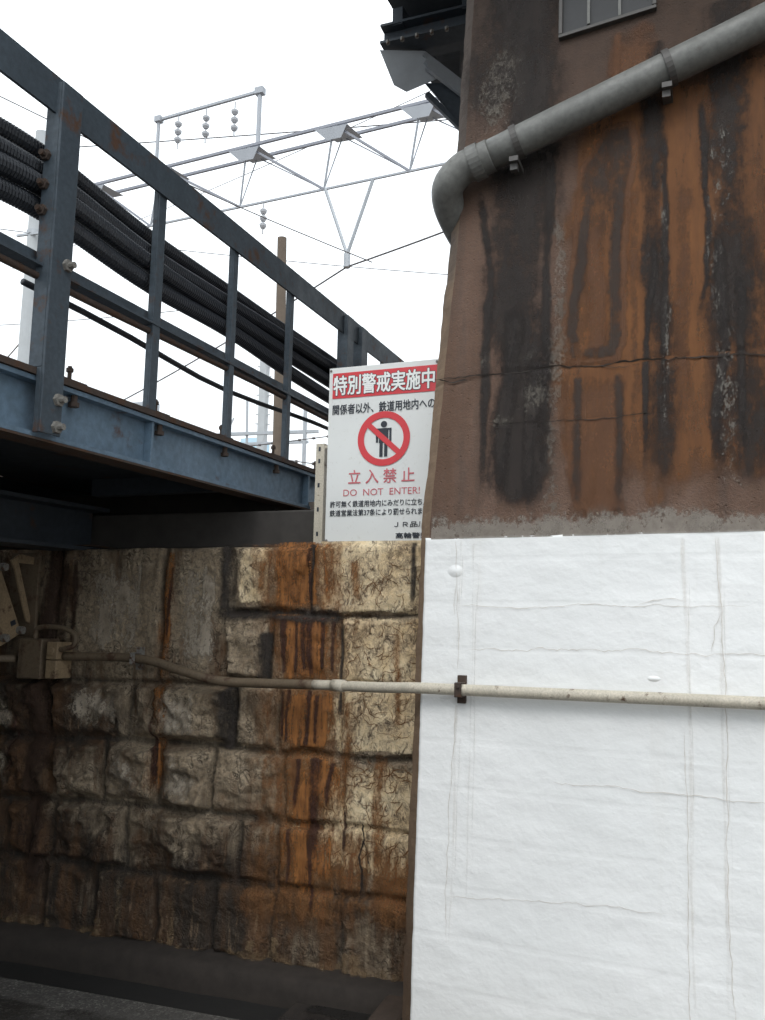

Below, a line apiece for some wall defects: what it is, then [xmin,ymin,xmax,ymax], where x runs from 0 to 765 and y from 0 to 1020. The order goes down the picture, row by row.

water stain [465,0,560,129]
corrosion [608,22,655,77]
water stain [646,40,663,60]
water stain [709,0,750,28]
water stain [479,141,561,504]
crack [437,352,765,383]
water stain [638,93,676,474]
corrosion [552,50,765,516]
water stain [698,50,765,476]
corrosion [147,553,175,790]
corrosion [241,542,409,931]